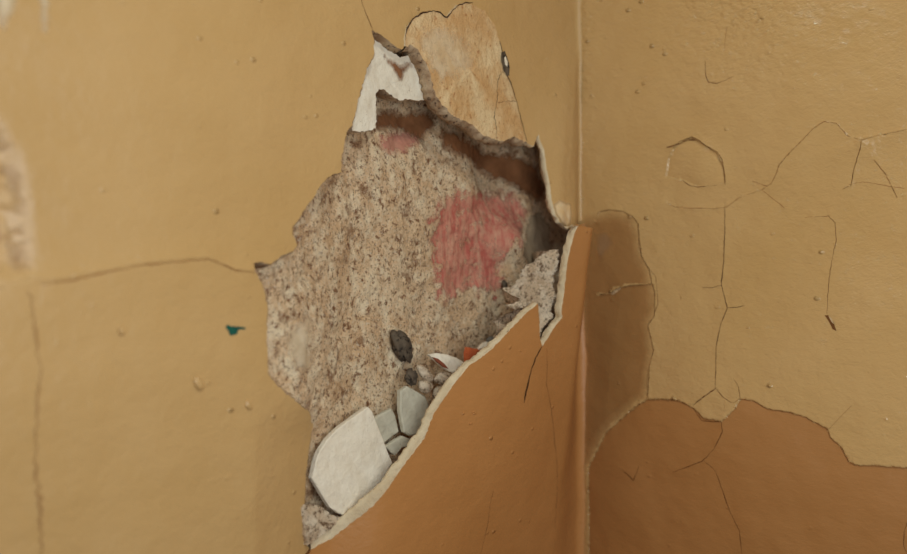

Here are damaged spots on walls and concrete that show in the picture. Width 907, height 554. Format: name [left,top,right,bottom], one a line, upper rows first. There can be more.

crack [27,259,253,554]
flaking render [254,3,579,517]
crack [597,210,658,397]
peeling [588,399,907,554]
crack [668,121,905,552]